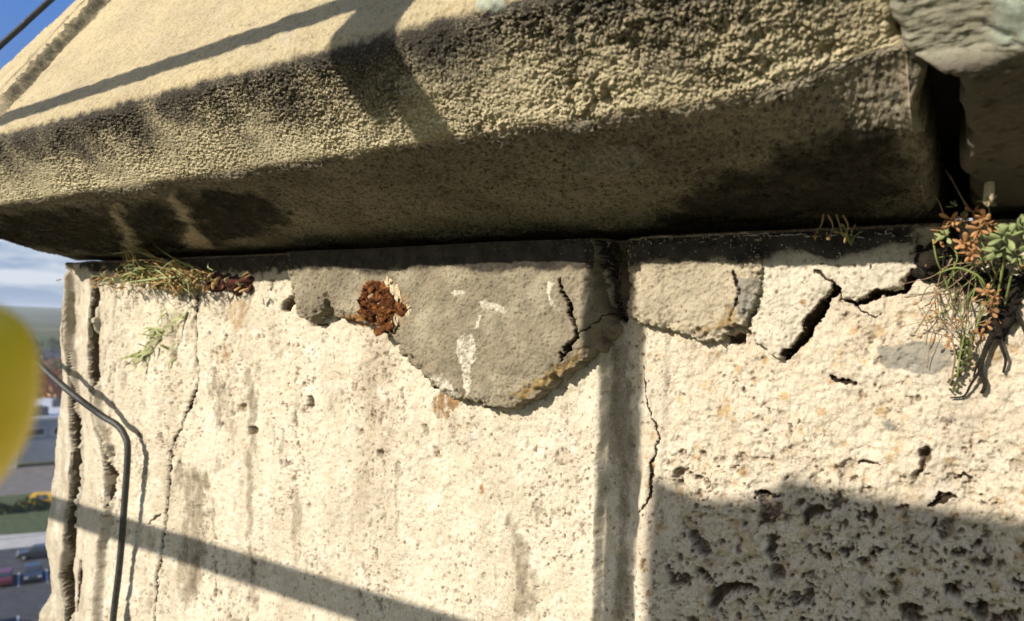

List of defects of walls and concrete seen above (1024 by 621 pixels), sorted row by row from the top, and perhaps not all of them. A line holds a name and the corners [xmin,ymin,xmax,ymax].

peeling [365,275,412,336]
crack [558,279,617,362]
crack [729,270,741,322]
crack [781,268,919,361]
crack [62,277,119,621]
crack [148,295,200,621]
crack [639,366,661,513]